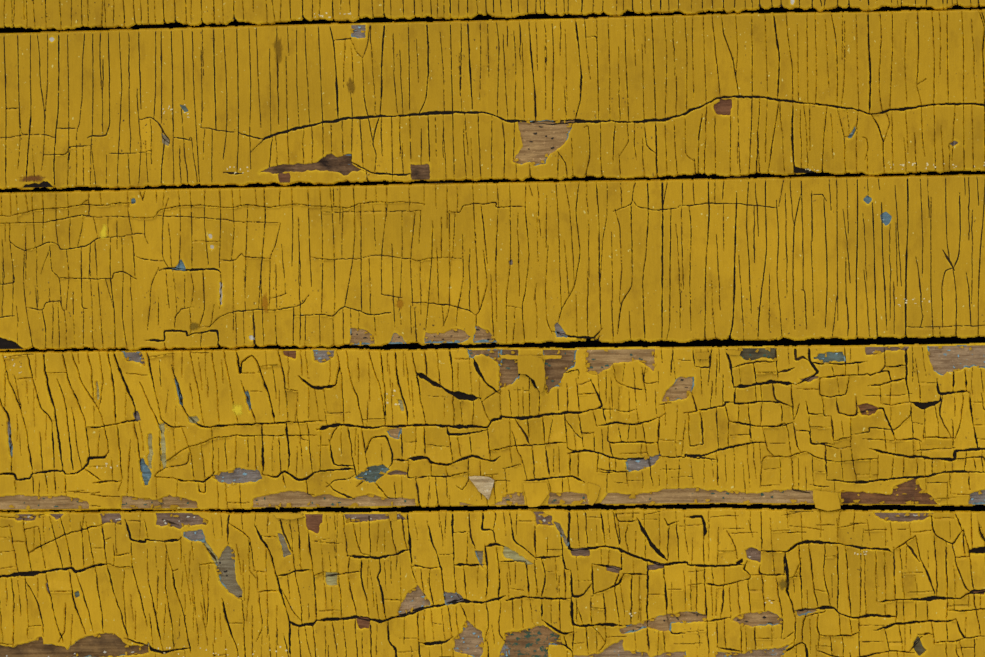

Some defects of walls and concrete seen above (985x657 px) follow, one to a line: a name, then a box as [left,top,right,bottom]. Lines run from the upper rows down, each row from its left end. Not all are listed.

peeling [513,119,575,166]
peeling [261,154,364,182]
crack [0,0,985,339]
peeling [0,337,23,349]
peeling [425,326,657,393]
peeling [927,345,985,375]
crack [0,186,985,657]
peeling [0,495,89,521]
peeling [100,495,243,600]
peeling [0,633,149,657]
peeling [500,625,563,657]
peeling [574,611,707,657]